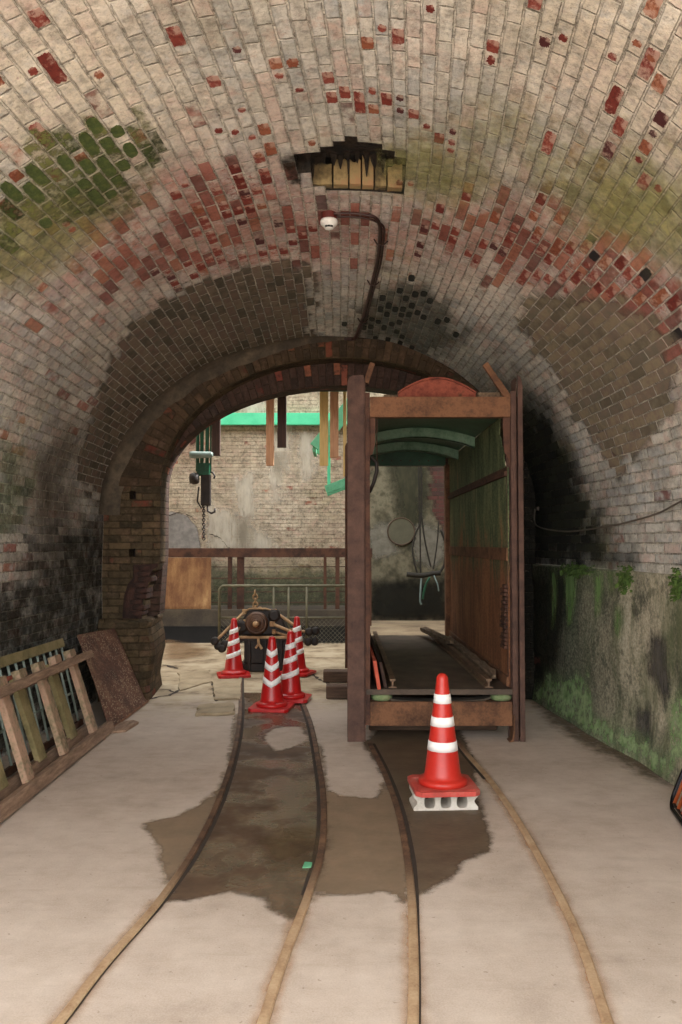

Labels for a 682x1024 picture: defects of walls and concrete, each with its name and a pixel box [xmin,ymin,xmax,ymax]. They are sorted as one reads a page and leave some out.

peeling [206,76,221,88]
peeling [268,58,299,79]
peeling [170,183,189,200]
spalling [211,123,414,226]
water stain [523,398,633,699]
crack [151,665,180,699]
water stain [648,635,669,699]
water stain [144,693,491,919]